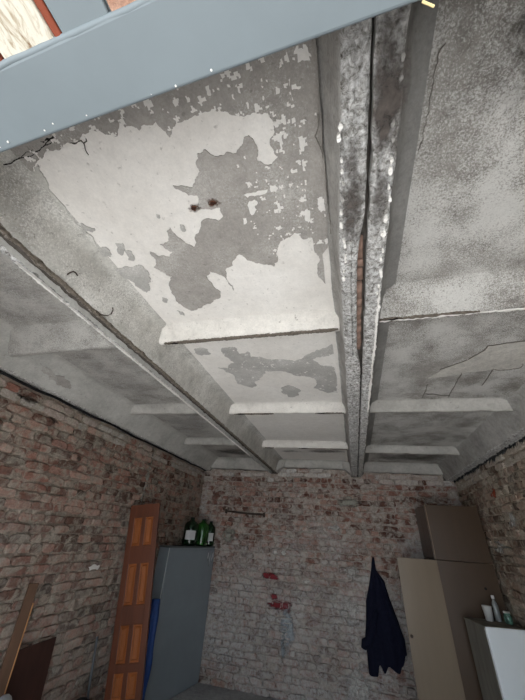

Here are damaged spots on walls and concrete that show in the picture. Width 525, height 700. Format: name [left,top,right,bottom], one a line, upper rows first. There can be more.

water stain [373,7,411,151]
crack [418,43,446,151]
crack [3,136,53,165]
peeling [0,39,328,315]
water stain [342,144,364,241]
water stain [373,174,386,221]
peeling [164,328,338,393]
peeling [281,385,301,397]
crack [422,341,525,399]